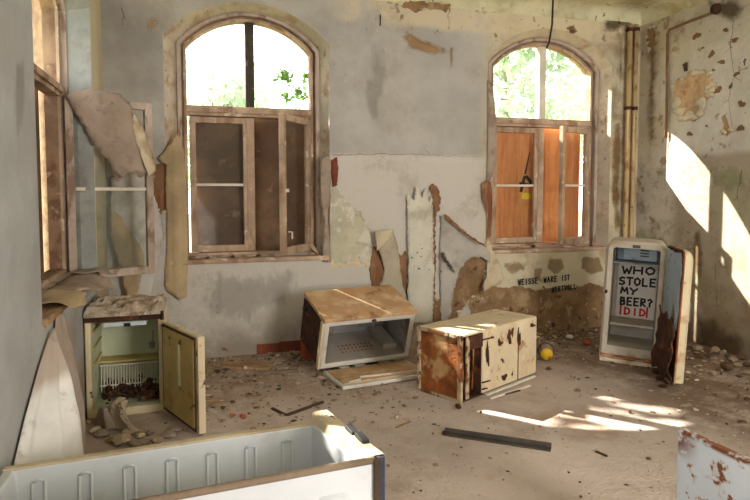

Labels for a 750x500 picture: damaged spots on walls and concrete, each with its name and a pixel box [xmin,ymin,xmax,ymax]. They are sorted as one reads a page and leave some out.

spalling [398,0,451,13]
spalling [670,47,746,122]
spalling [320,80,604,332]